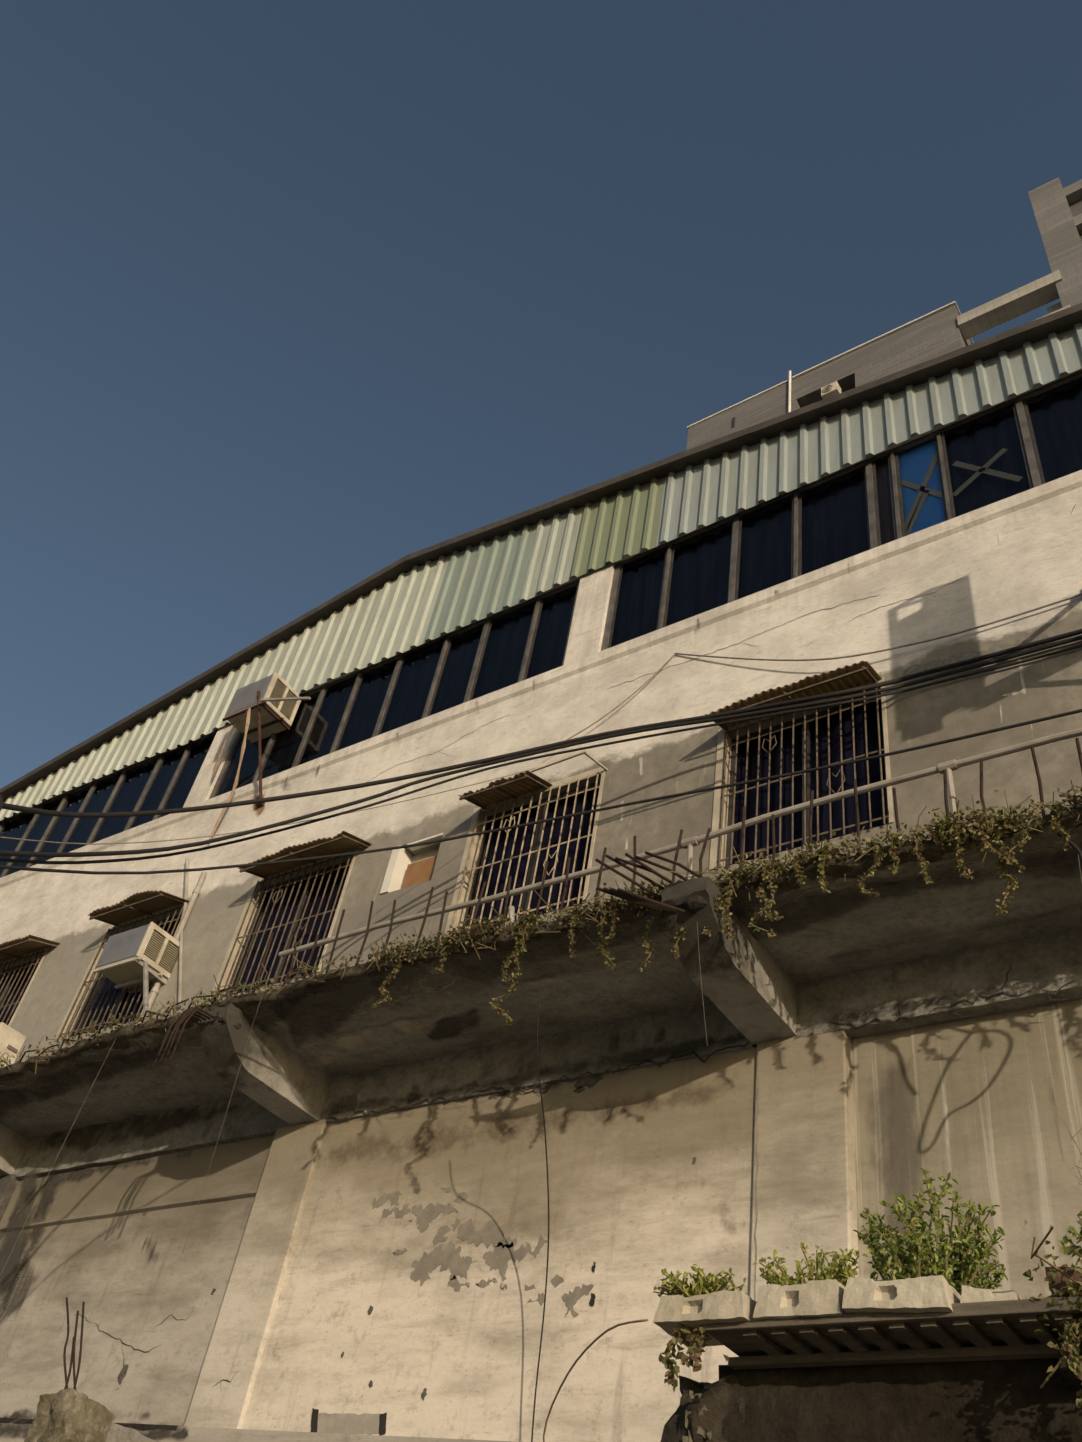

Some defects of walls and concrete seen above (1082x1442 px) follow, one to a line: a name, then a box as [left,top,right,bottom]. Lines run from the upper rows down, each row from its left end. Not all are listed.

crack [827,964,1074,1029]
peeling [372,1184,548,1292]
peeling [524,1262,596,1317]
crack [74,1311,193,1367]